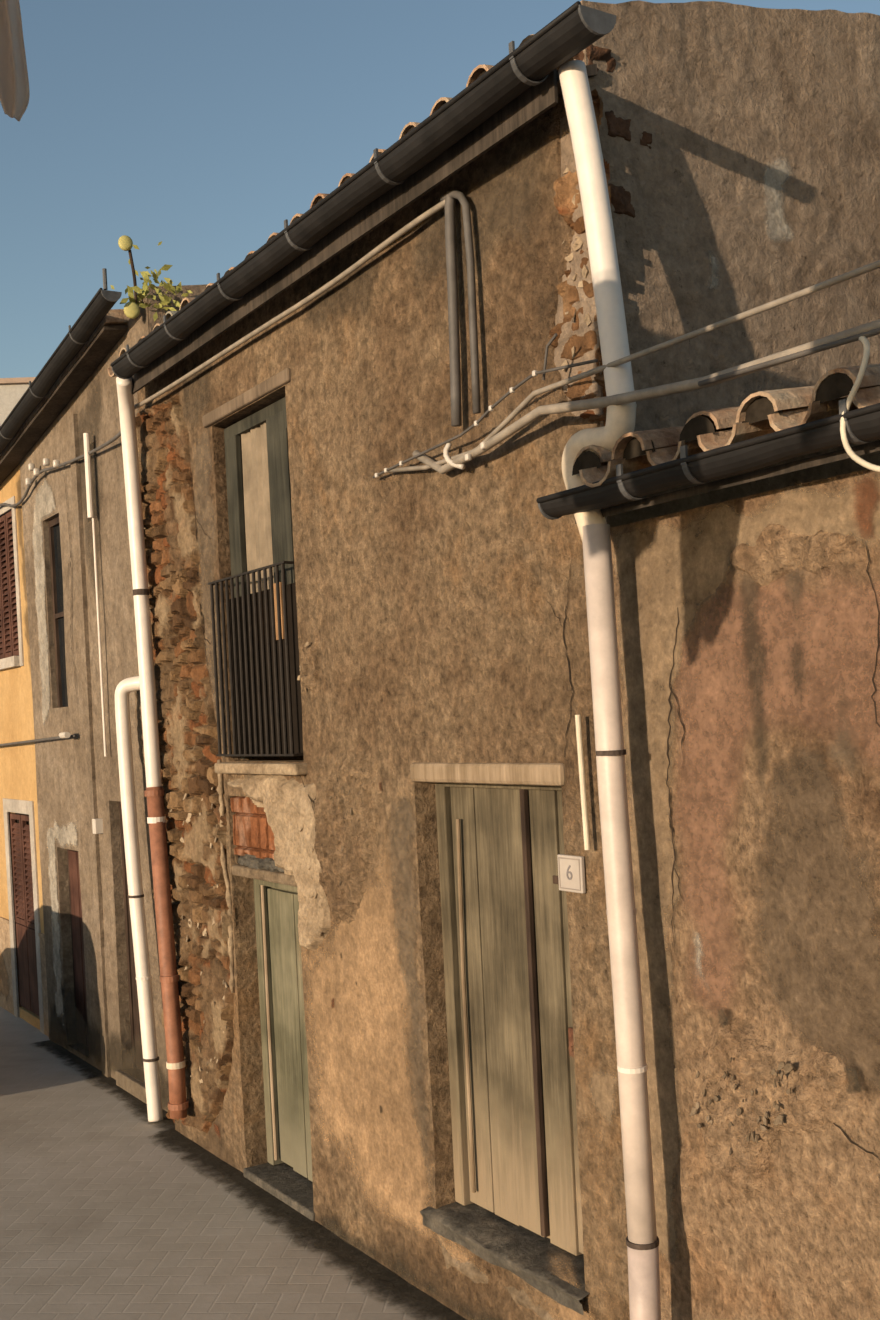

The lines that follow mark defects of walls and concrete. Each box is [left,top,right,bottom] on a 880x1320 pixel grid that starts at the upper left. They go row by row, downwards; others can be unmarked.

spalling [549,154,607,426]
spalling [574,44,616,72]
spalling [603,159,635,218]
spalling [591,89,652,149]
flaking render [134,395,382,1133]
crack [666,607,685,950]
peeling [676,478,880,1207]
crack [834,1123,880,1160]